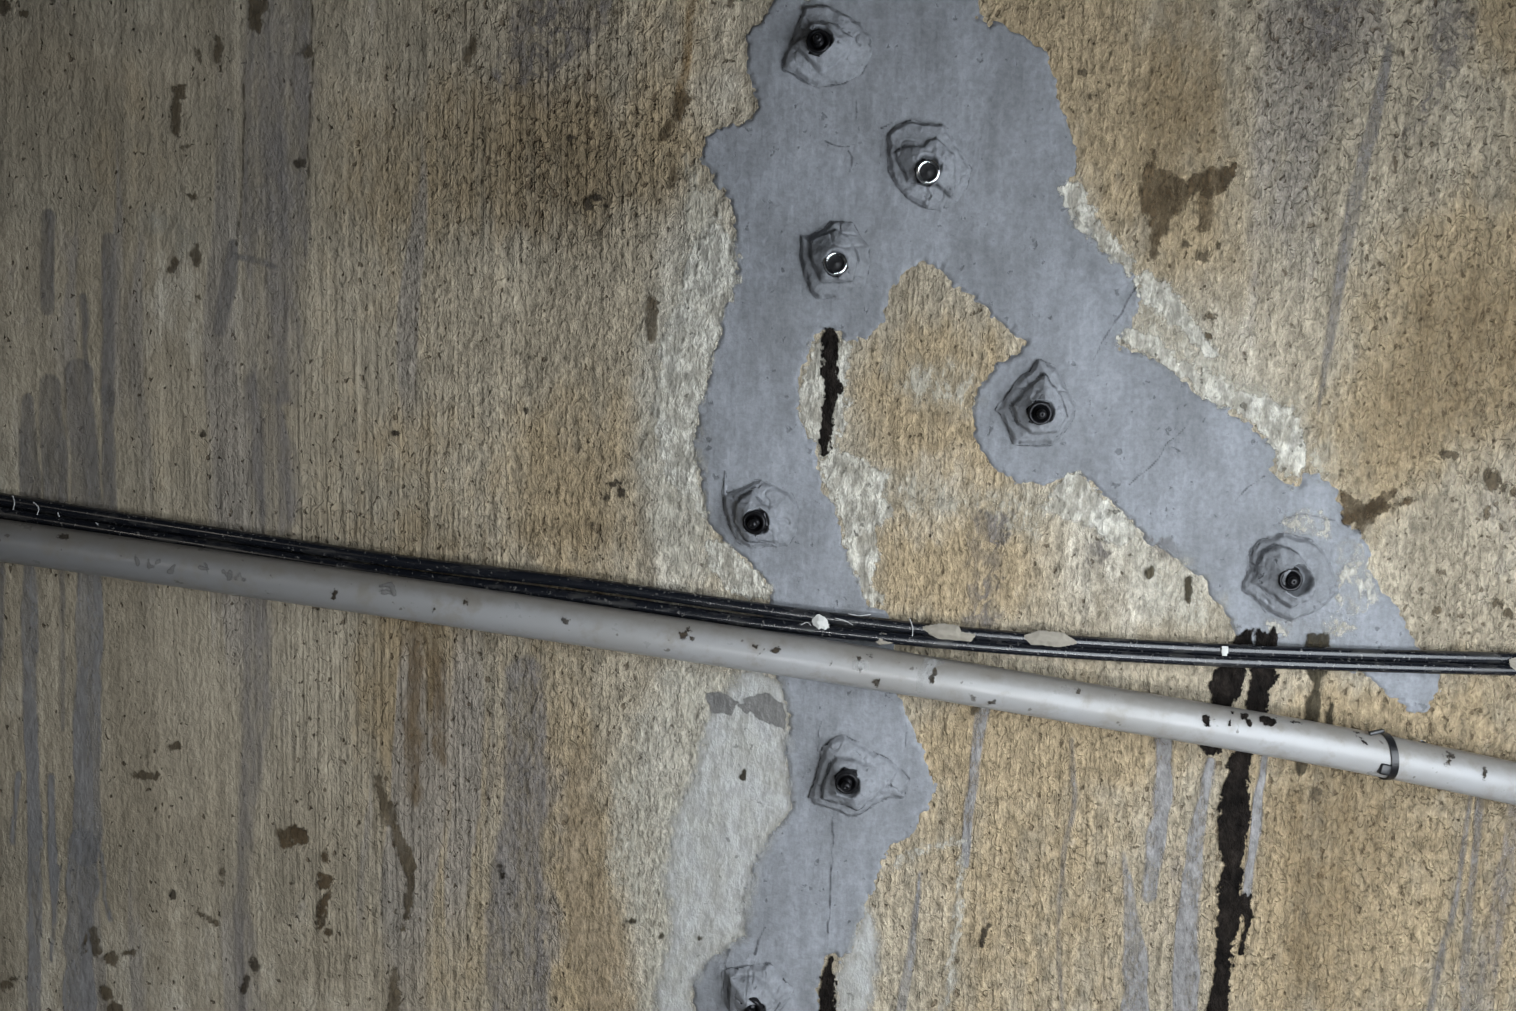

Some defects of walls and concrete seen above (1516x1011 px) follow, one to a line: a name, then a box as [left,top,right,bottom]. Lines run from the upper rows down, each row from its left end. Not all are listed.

damp [20,240,116,511]
damp [1057,153,1320,478]
damp [1324,47,1391,363]
damp [11,567,111,1011]
damp [894,707,990,1008]
damp [1121,738,1172,1011]
damp [1172,744,1267,1011]
damp [1209,667,1280,713]
damp [1233,621,1287,646]
damp [1304,670,1334,725]
damp [1282,483,1419,648]
damp [1430,797,1482,1011]